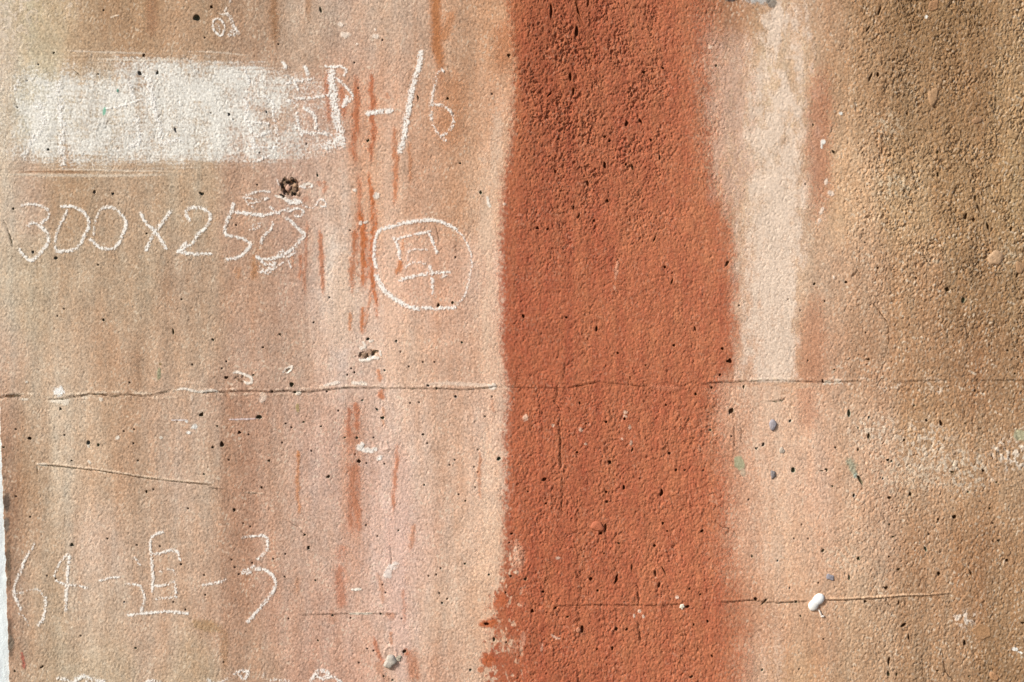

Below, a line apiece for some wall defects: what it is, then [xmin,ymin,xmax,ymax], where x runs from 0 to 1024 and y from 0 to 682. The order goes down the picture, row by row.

corrosion [325,74,377,159]
corrosion [299,233,324,289]
corrosion [349,177,377,331]
corrosion [478,0,752,682]
corrosion [347,403,359,442]